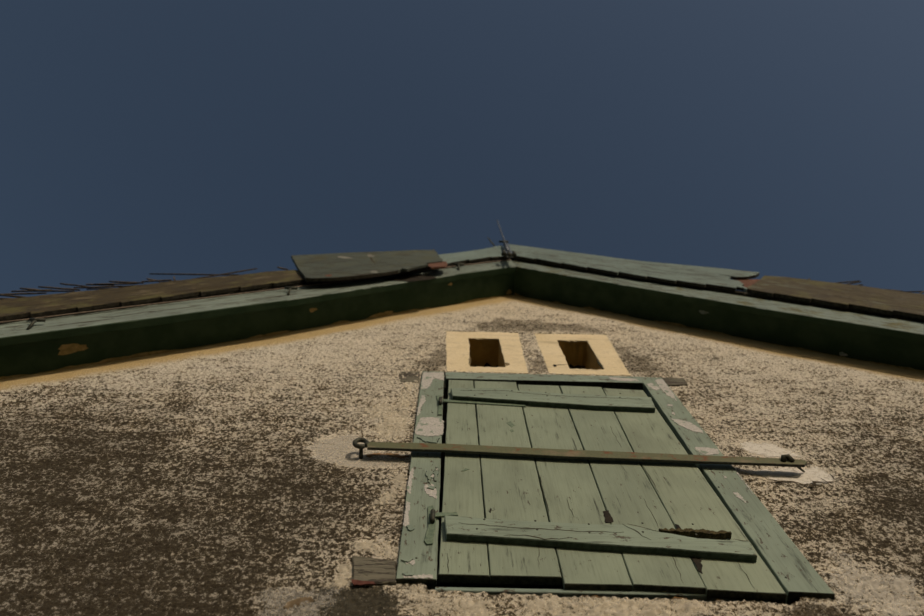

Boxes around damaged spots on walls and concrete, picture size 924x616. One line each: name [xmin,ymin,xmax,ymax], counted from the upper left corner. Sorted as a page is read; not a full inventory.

peeling [58,343,88,355]
peeling [415,372,445,443]
peeling [403,467,414,531]
peeling [424,464,439,499]
peeling [401,558,433,579]
damp [306,585,405,616]